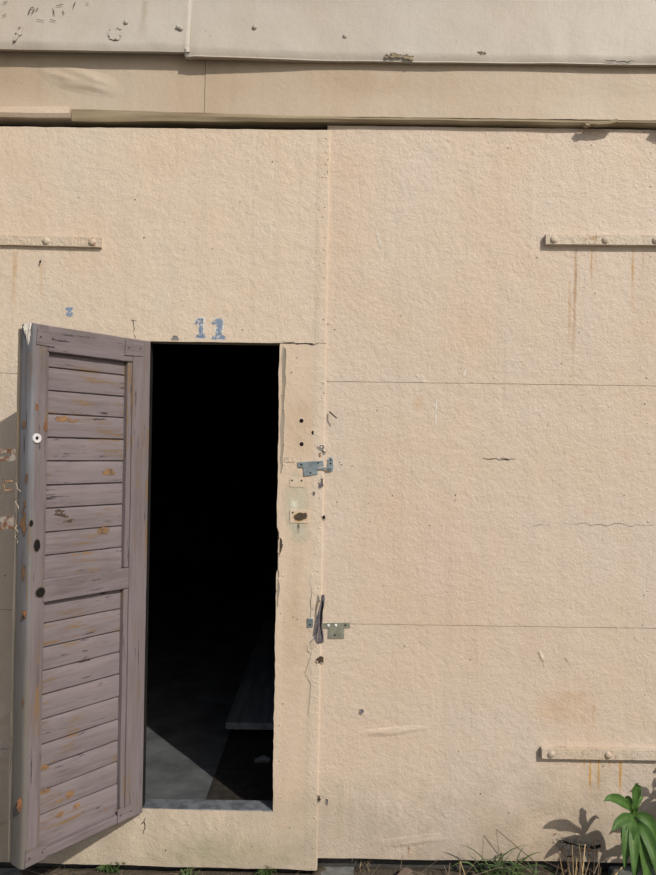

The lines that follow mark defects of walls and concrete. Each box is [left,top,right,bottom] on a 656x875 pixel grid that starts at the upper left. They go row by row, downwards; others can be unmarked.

spalling [554,833,601,865]